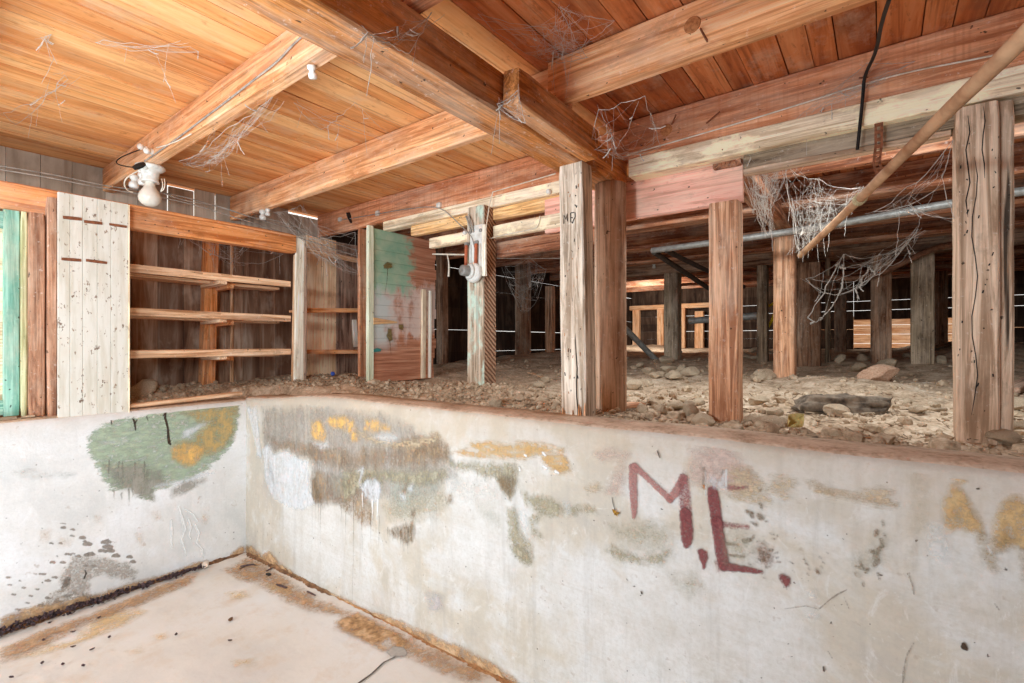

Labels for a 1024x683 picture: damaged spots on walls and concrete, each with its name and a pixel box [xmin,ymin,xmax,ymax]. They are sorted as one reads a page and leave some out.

leakage [248,408,594,562]